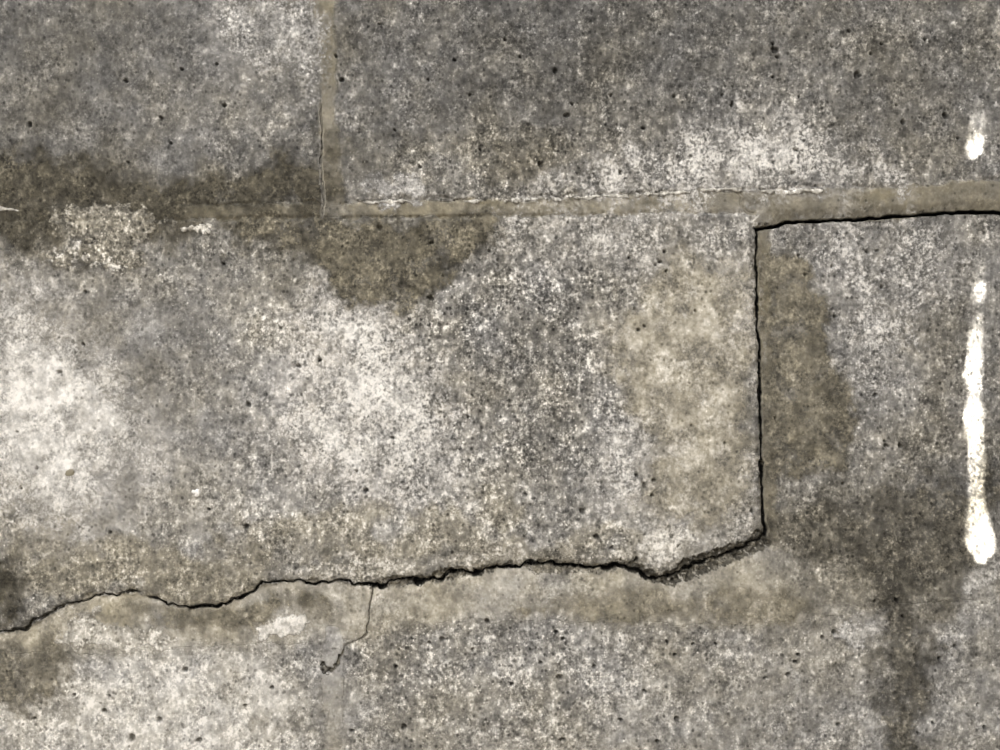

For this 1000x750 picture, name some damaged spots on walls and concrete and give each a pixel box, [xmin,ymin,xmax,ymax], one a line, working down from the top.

damp [0,106,958,542]
crack [0,193,1000,671]
damp [766,454,1000,750]